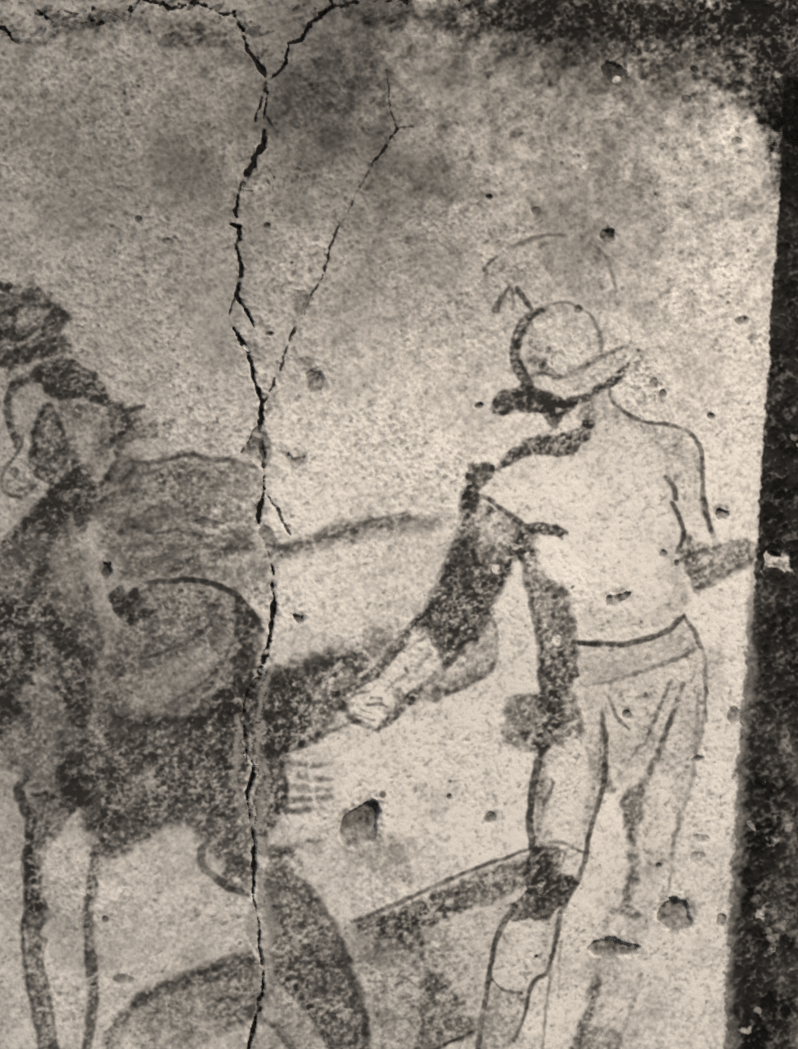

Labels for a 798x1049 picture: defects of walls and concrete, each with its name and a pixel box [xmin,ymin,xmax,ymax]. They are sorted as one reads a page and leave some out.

crack [0,26,14,41]
crack [37,6,104,26]
crack [128,0,358,535]
crack [308,79,398,304]
crack [235,551,277,1049]
flaking render [340,791,386,836]